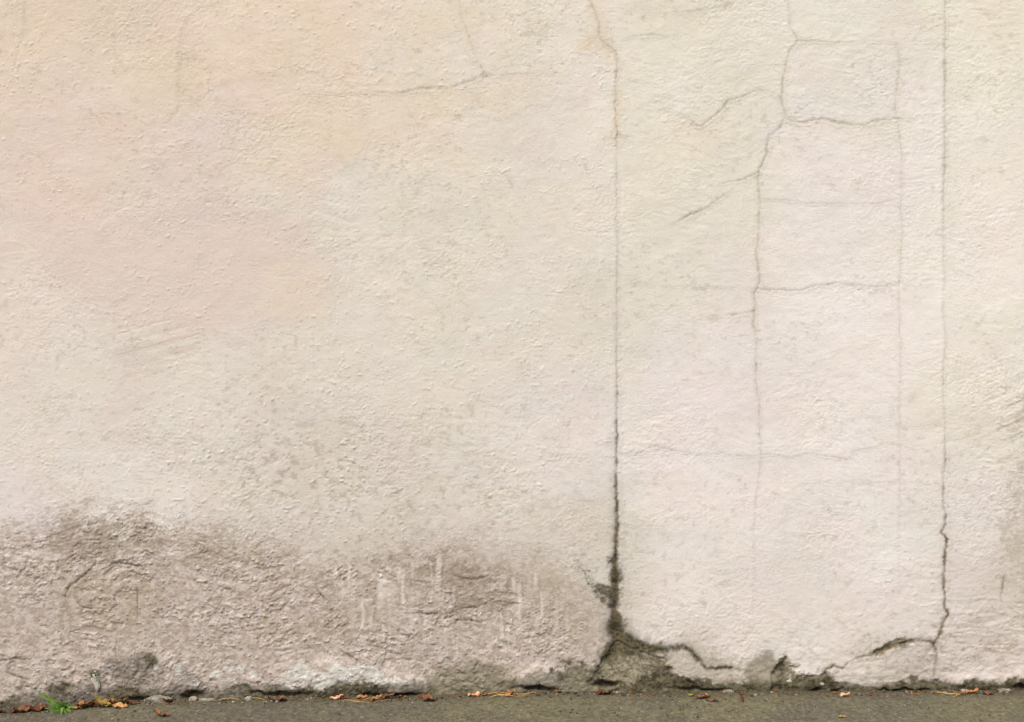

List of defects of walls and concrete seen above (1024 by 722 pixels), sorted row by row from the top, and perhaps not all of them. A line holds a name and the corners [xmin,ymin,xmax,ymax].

crack [575,0,955,690]
damp [0,497,603,710]
spalling [609,660,651,686]